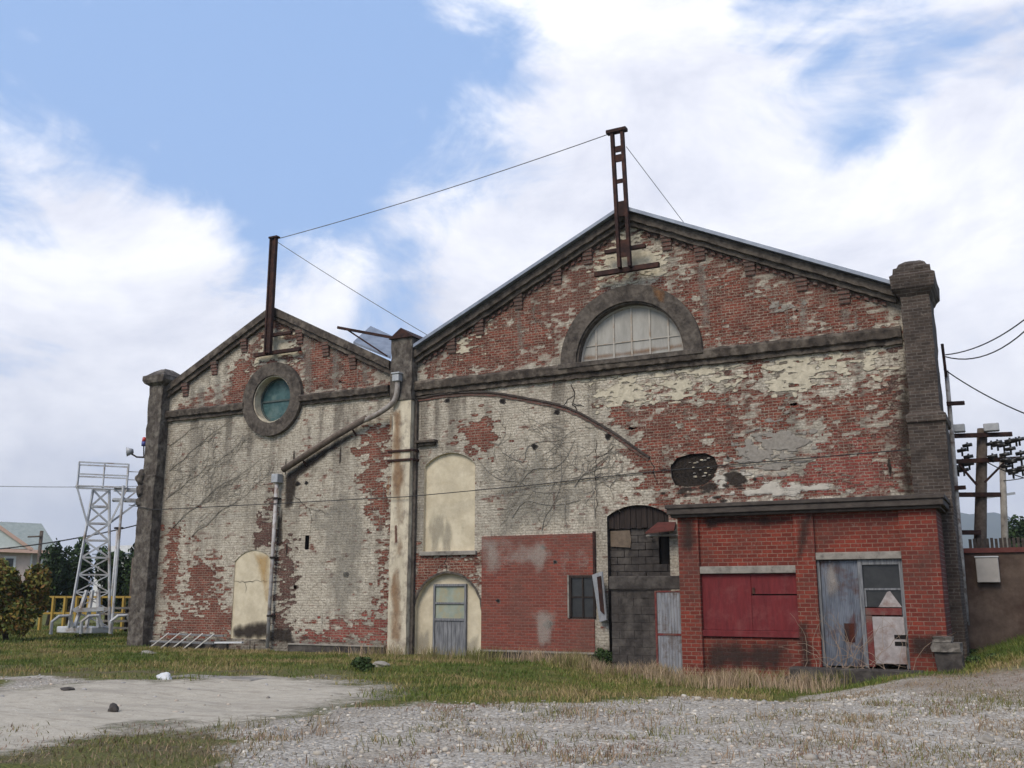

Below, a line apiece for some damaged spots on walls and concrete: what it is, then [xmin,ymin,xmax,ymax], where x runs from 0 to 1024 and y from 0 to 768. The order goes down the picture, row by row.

peeling [221,328,374,404]
peeling [423,302,556,379]
peeling [450,399,514,462]
peeling [580,340,913,507]
peeling [248,423,393,649]
peeling [158,520,238,648]
water stain [234,606,292,650]